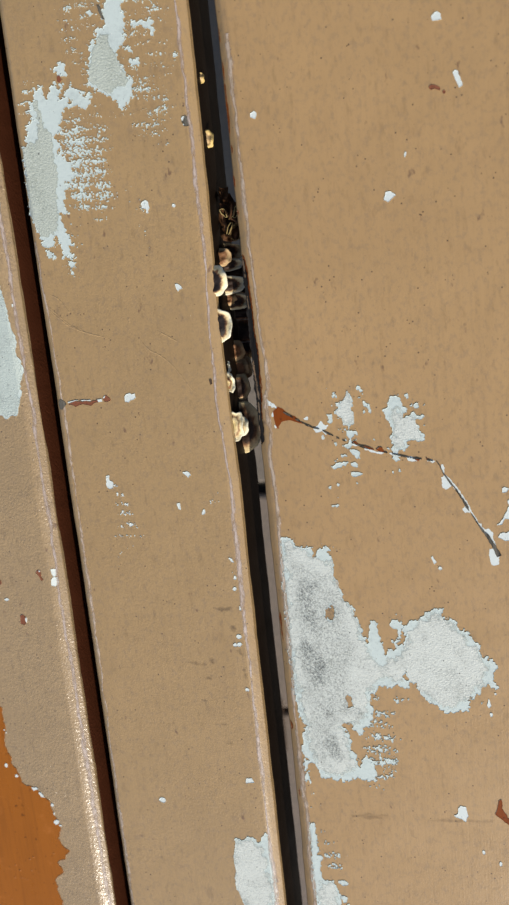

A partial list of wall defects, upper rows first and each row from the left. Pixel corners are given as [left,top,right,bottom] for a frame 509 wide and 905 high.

peeling [18,0,178,277]
peeling [0,290,24,419]
peeling [326,386,371,484]
crack [267,399,501,566]
peeling [382,394,425,474]
peeling [497,487,509,541]
peeling [279,537,499,795]
peeling [0,707,70,905]
peeling [495,800,509,825]
peeling [234,833,277,905]
peeling [309,822,350,905]